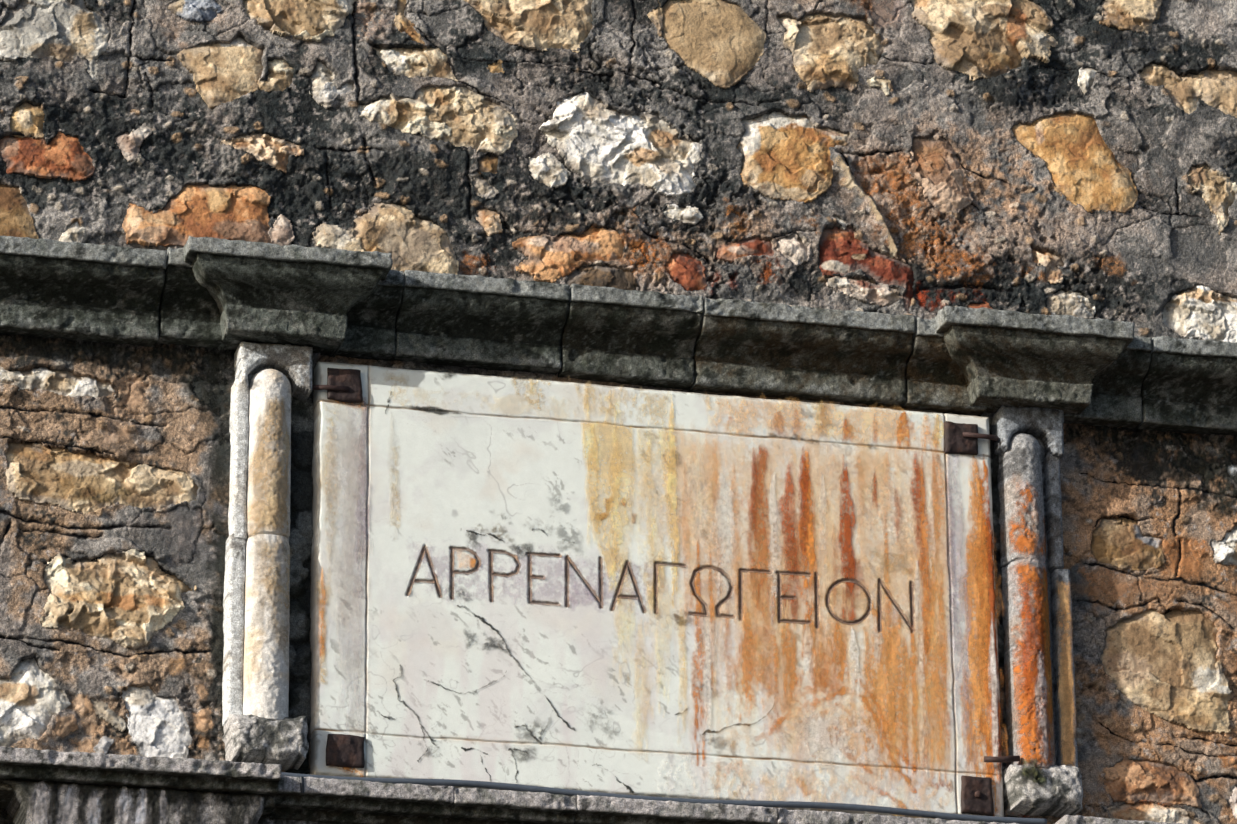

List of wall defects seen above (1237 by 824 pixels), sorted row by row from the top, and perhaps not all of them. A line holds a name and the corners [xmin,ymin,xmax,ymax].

spalling [103,374,144,447]
crack [0,510,173,576]
corrosion [596,497,626,520]
spalling [1080,537,1206,606]
crack [1076,473,1237,629]
crack [0,635,212,657]
corrosion [692,542,714,764]
corrosion [736,412,949,809]
corrosion [961,460,1074,812]
peeling [53,694,102,753]
peeling [193,684,213,749]
crack [381,665,575,780]